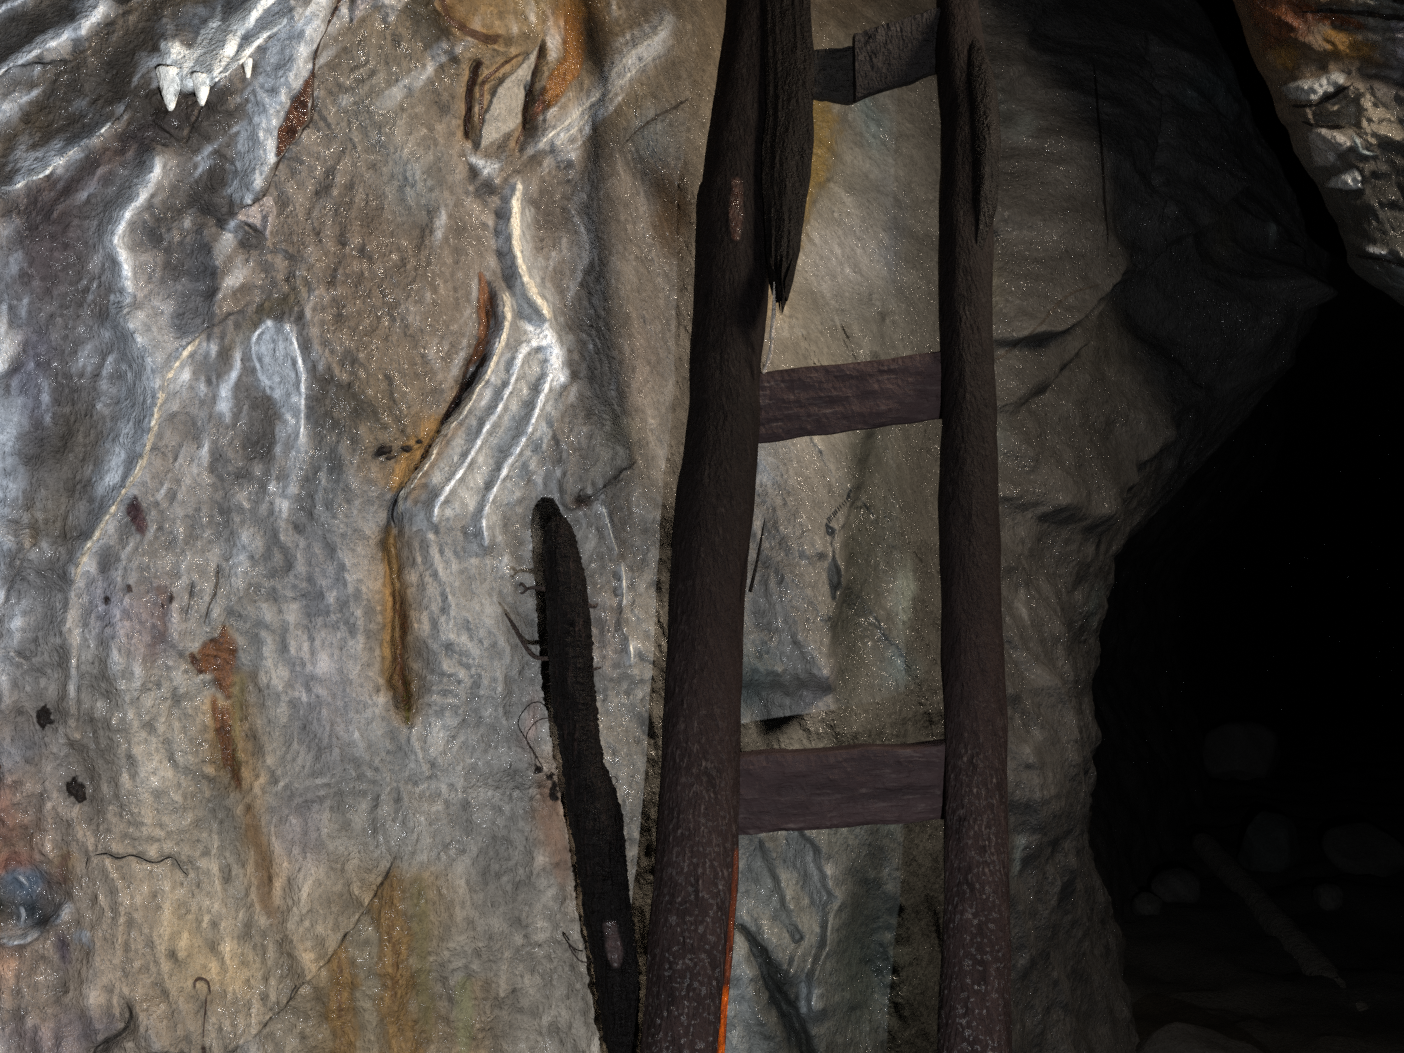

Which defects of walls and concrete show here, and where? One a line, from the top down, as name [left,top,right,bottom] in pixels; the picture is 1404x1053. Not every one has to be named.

rust [189,625,243,788]
rust [381,527,410,724]